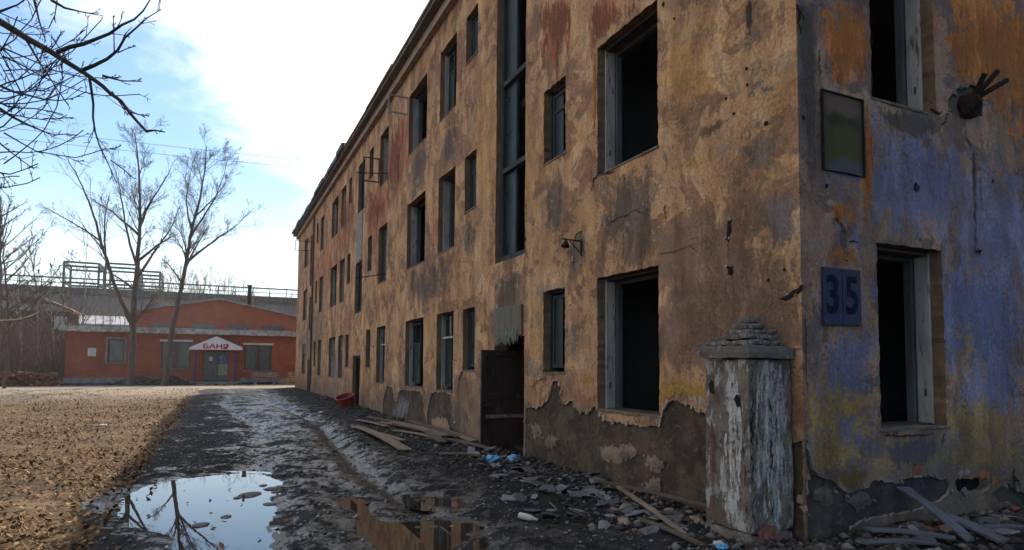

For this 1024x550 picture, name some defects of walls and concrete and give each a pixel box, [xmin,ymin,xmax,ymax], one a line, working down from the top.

rust [540,3,570,81]
spalling [948,84,974,118]
spalling [382,386,473,467]
spalling [512,378,707,511]
spalling [724,373,979,542]